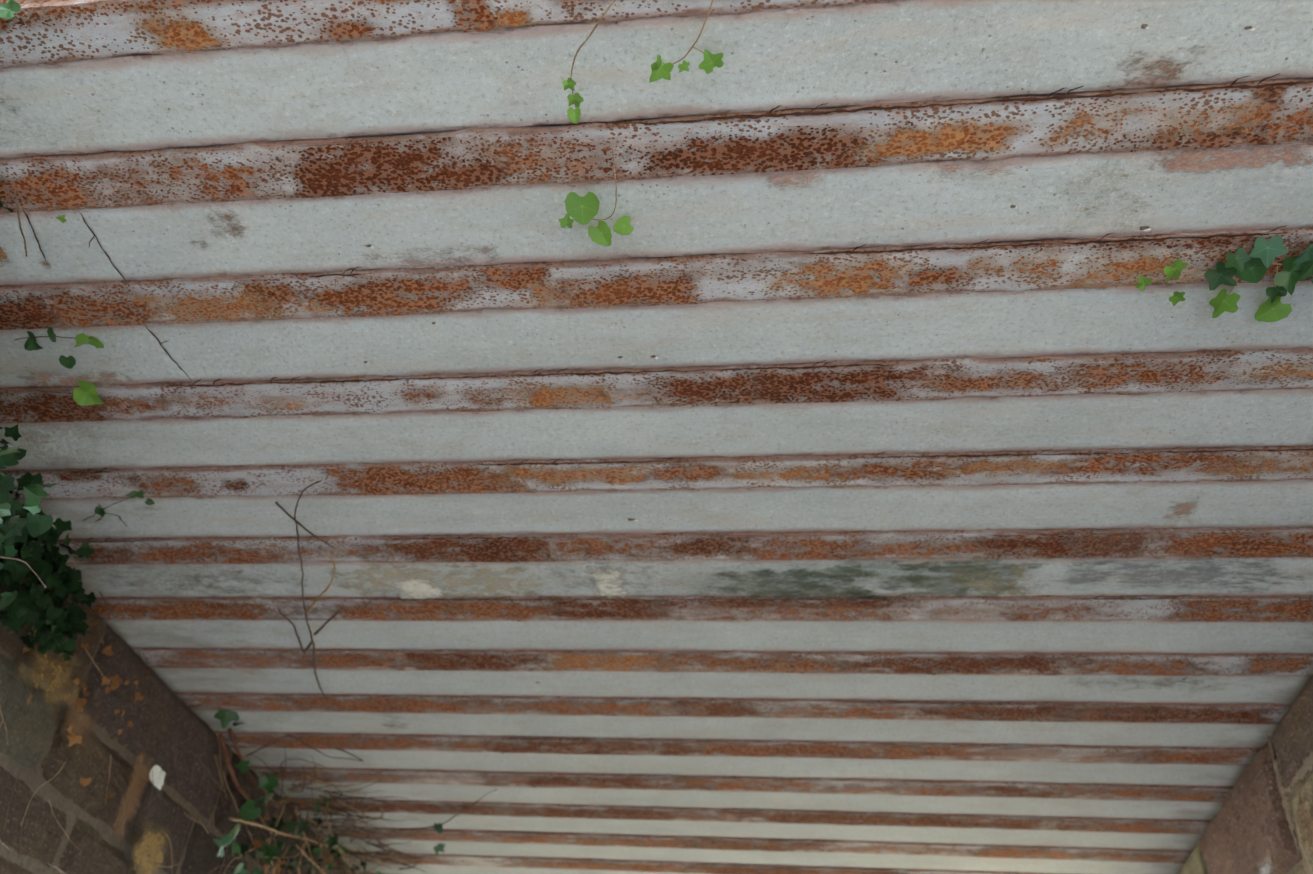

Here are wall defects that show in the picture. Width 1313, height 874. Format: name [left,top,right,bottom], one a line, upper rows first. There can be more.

corrosion [0,56,1313,236]
corrosion [0,234,1313,330]
corrosion [399,356,1313,409]
corrosion [317,450,1313,496]
corrosion [59,531,1313,565]
water stain [334,564,542,599]
water stain [583,563,632,598]
water stain [703,559,1028,599]
water stain [1051,558,1287,592]
corrosion [145,651,1219,676]
corrosion [183,695,1276,724]
corrosion [224,735,1258,765]